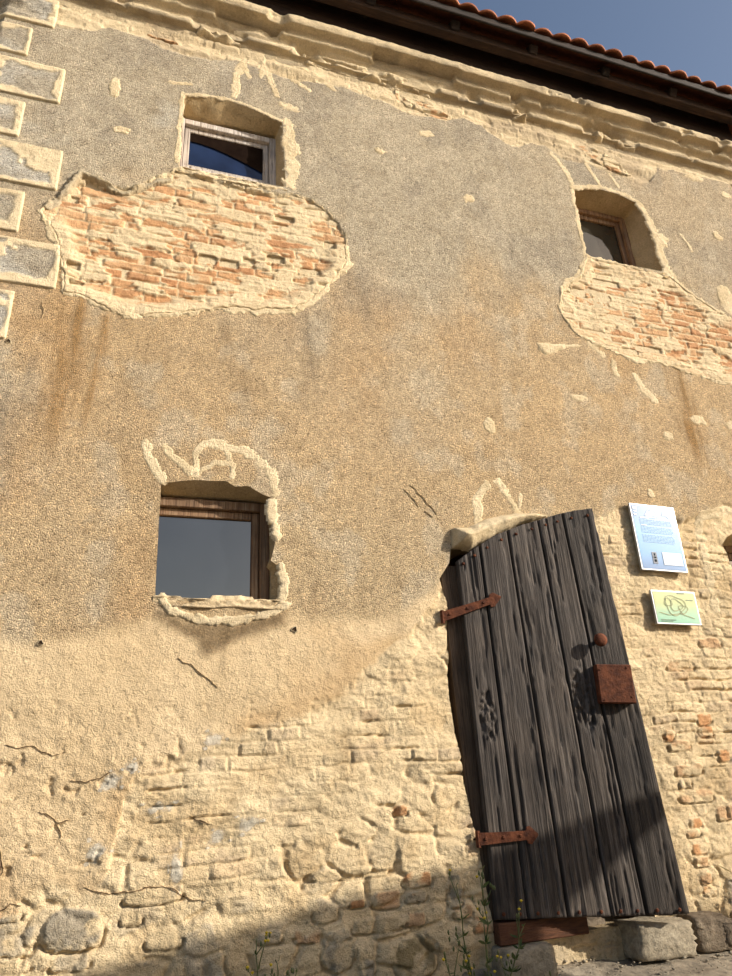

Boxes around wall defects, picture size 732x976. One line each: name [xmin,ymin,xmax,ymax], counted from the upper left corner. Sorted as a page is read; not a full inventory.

spalling [394,90,449,120]
spalling [578,146,632,177]
spalling [37,91,354,320]
spalling [537,184,732,385]
peeling [688,415,707,426]
spalling [157,562,292,627]
crack [178,658,217,687]
crack [6,744,67,756]
crack [71,771,113,784]
crack [39,811,69,838]
crack [0,850,8,876]
crack [83,886,204,901]